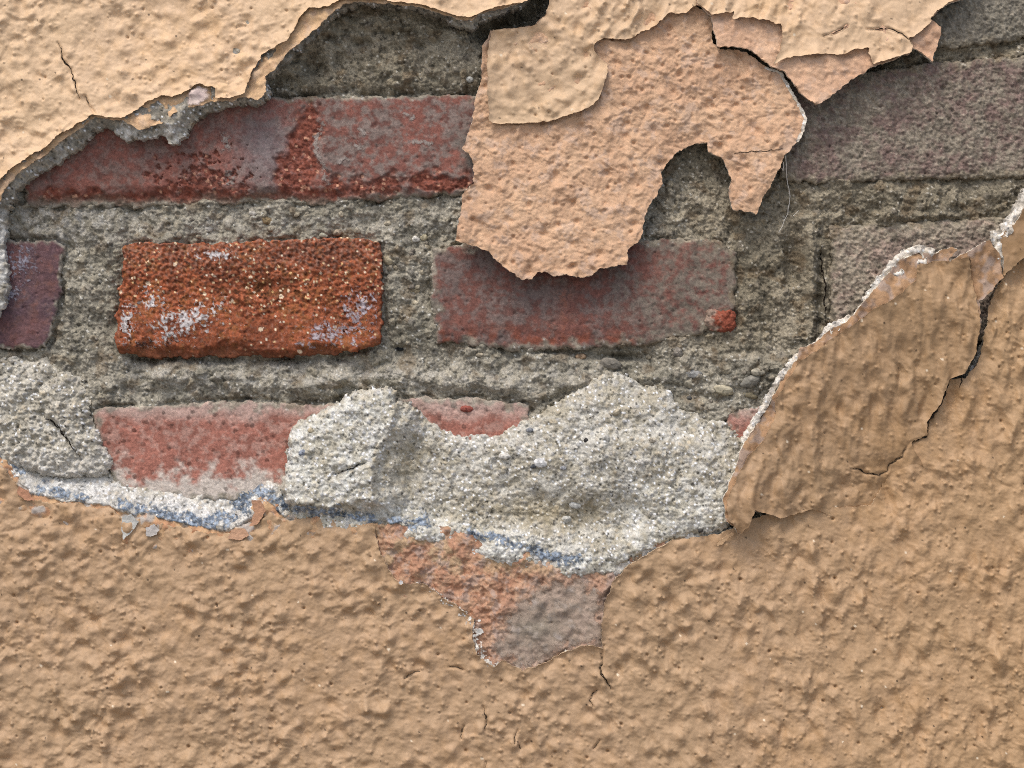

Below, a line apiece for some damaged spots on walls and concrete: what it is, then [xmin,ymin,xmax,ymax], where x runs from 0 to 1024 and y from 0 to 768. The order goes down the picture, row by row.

crack [60,47,92,108]
peeling [188,86,209,105]
flaking render [455,0,961,280]
damp [120,286,226,350]
damp [296,286,377,348]
crack [44,416,80,457]
crack [853,378,963,475]
flaking render [1,372,743,670]